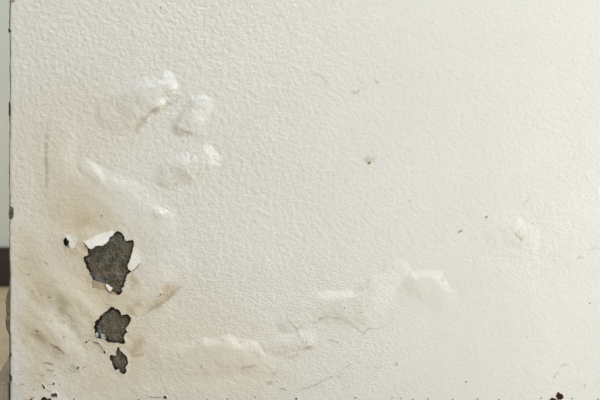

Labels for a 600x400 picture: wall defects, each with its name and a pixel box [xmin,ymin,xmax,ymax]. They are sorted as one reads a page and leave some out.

peeling [60,224,141,379]